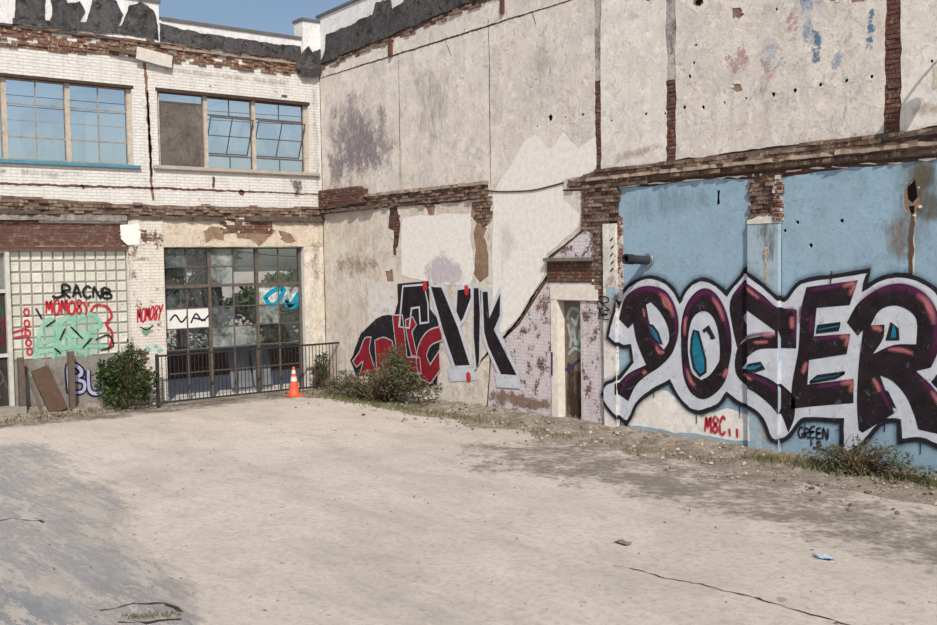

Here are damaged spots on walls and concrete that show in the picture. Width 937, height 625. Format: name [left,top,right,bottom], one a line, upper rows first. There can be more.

peeling [787,0,839,63]
peeling [851,0,875,50]
peeling [831,49,843,68]
water stain [328,96,392,182]
flaking render [204,226,226,243]
flaking render [237,228,296,246]
crack [100,602,191,624]